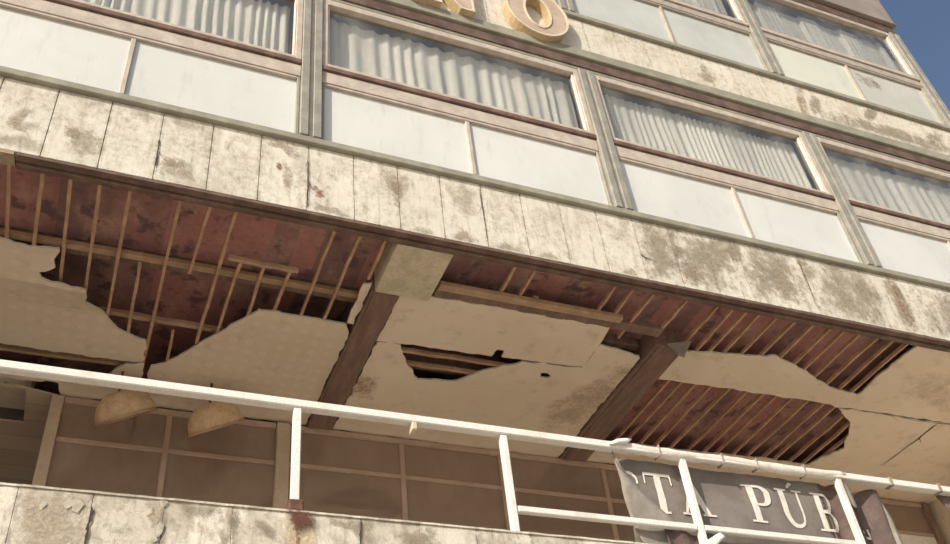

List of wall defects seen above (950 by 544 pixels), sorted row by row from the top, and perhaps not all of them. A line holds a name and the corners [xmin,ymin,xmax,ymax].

water stain [2,110,33,148]
water stain [833,109,947,151]
water stain [166,158,193,178]
water stain [642,223,882,321]
water stain [884,282,914,324]
crack [862,411,947,463]
water stain [218,510,238,544]
rust [287,509,317,544]
water stain [402,527,435,544]